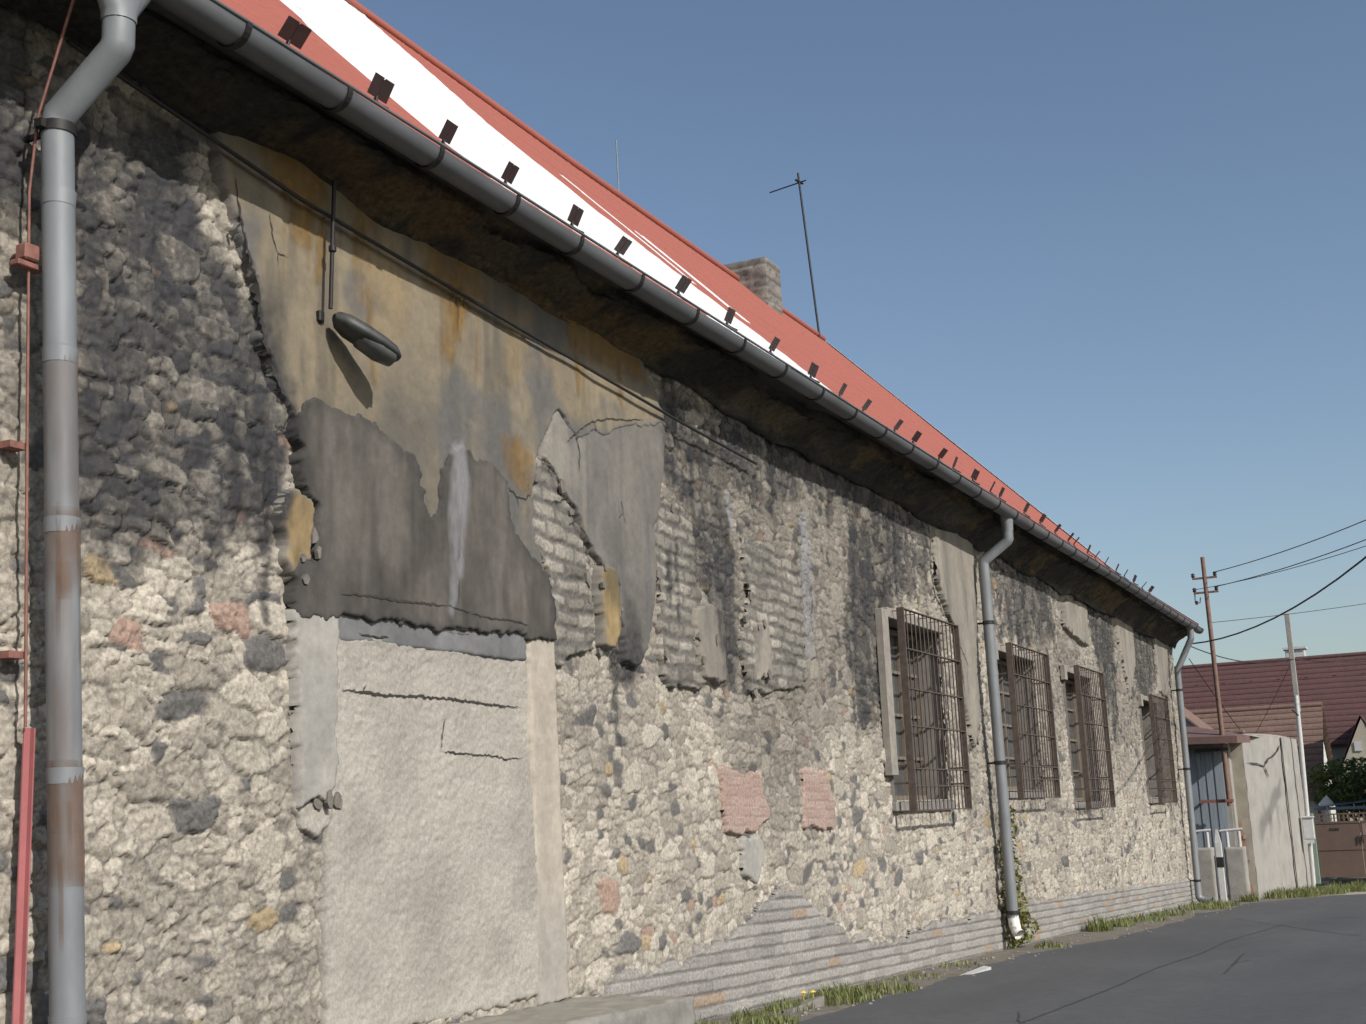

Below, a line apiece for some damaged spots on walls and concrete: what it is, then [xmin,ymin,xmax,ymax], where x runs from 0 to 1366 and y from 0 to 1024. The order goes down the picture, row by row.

leakage [75,112,294,621]
flaking render [271,488,322,585]
crack [509,418,644,553]
spalling [531,456,623,668]
leakage [662,379,928,723]
leakage [994,558,1054,650]
leakage [1088,605,1117,738]
leakage [1134,633,1155,695]